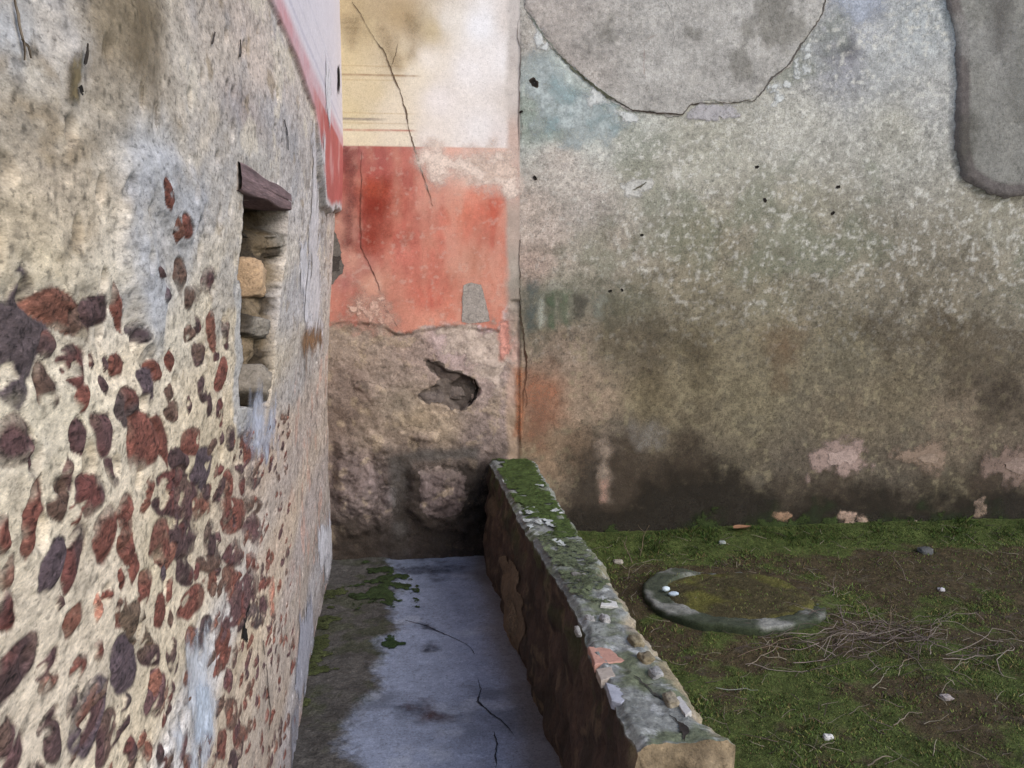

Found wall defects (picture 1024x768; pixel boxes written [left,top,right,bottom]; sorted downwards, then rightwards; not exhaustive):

crack [352,2,432,202]
crack [360,159,397,326]
flaking render [299,126,524,580]
water stain [565,429,1024,532]
peeling [806,440,875,482]
peeling [889,441,947,477]
peeling [981,445,1024,487]
crack [476,680,514,766]